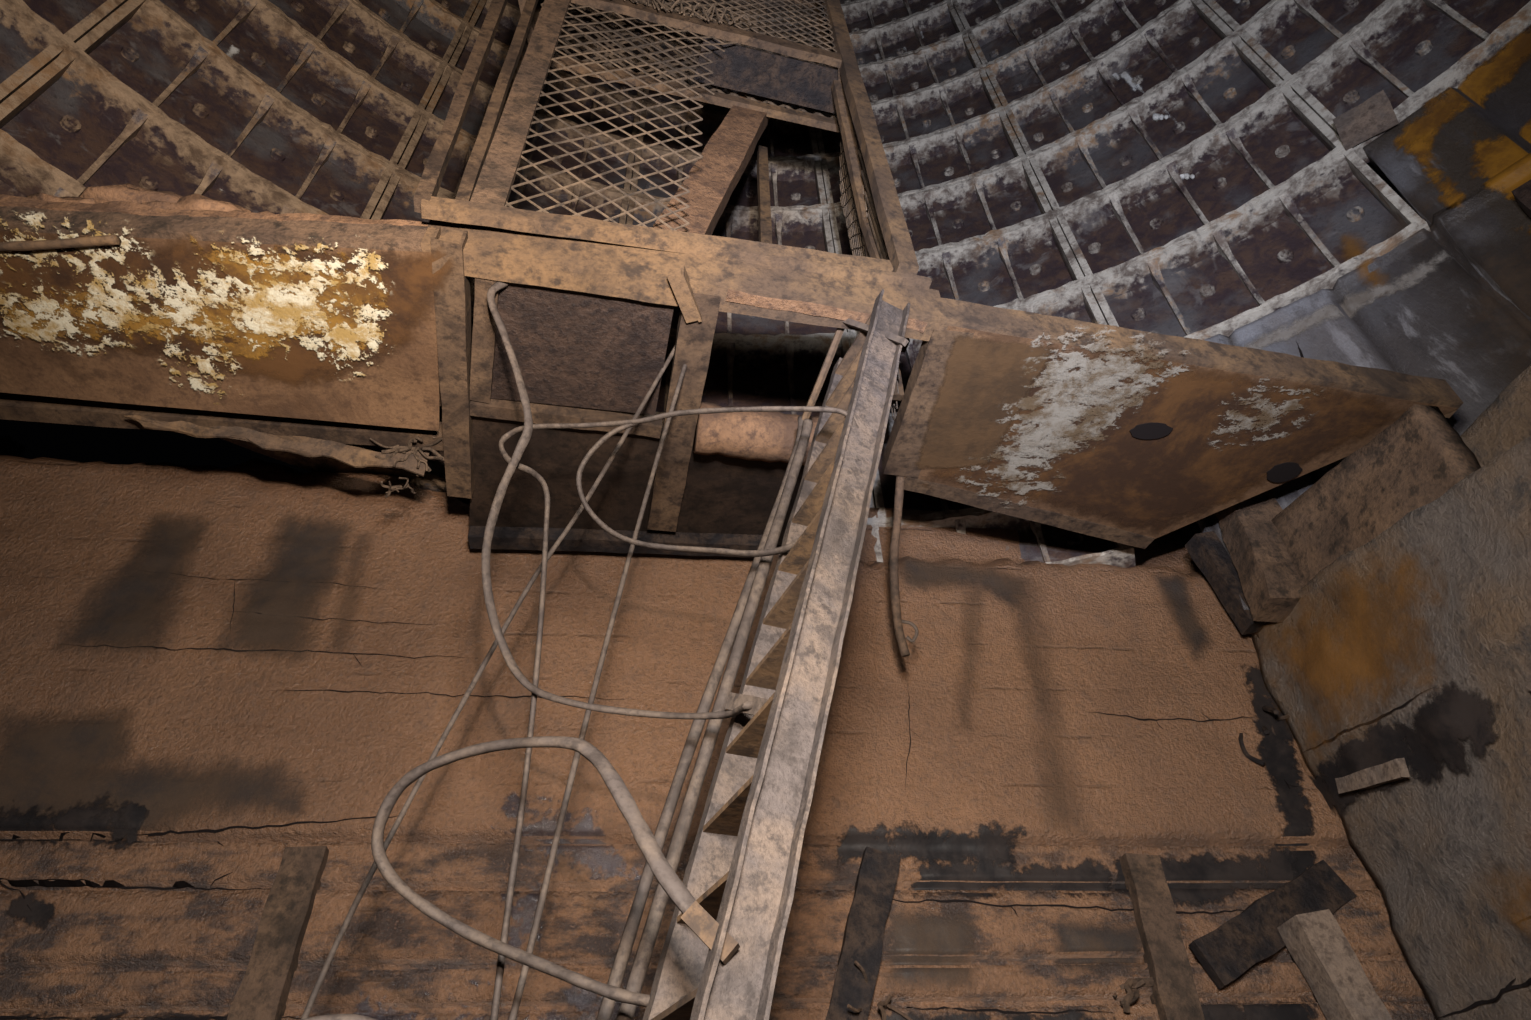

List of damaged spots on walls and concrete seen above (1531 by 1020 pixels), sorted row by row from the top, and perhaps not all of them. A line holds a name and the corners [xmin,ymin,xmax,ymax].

rust [1394,30,1531,208]
peeling [0,212,394,404]